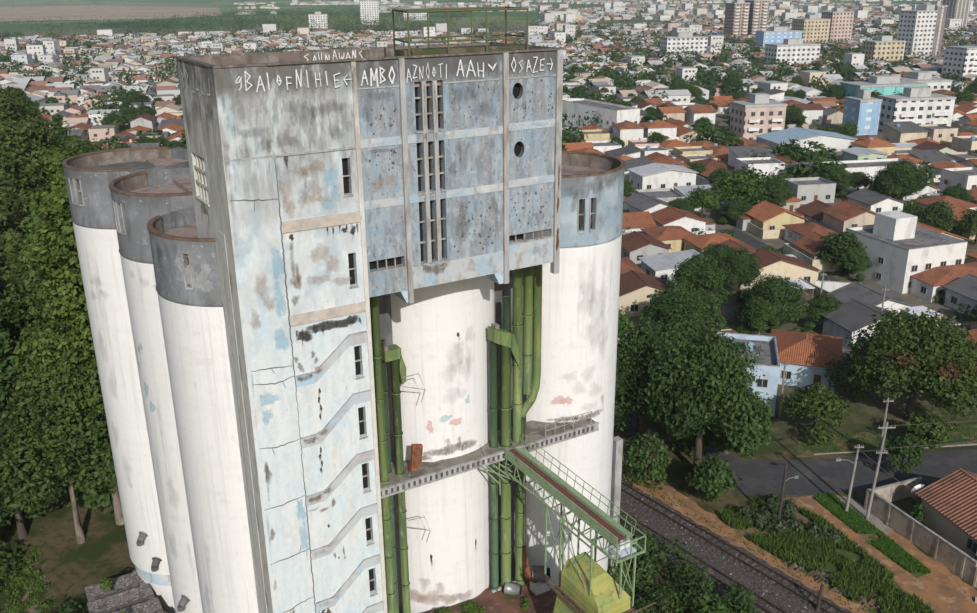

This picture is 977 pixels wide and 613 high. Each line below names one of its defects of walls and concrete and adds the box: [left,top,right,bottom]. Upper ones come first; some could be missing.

crack [222,159,316,613]